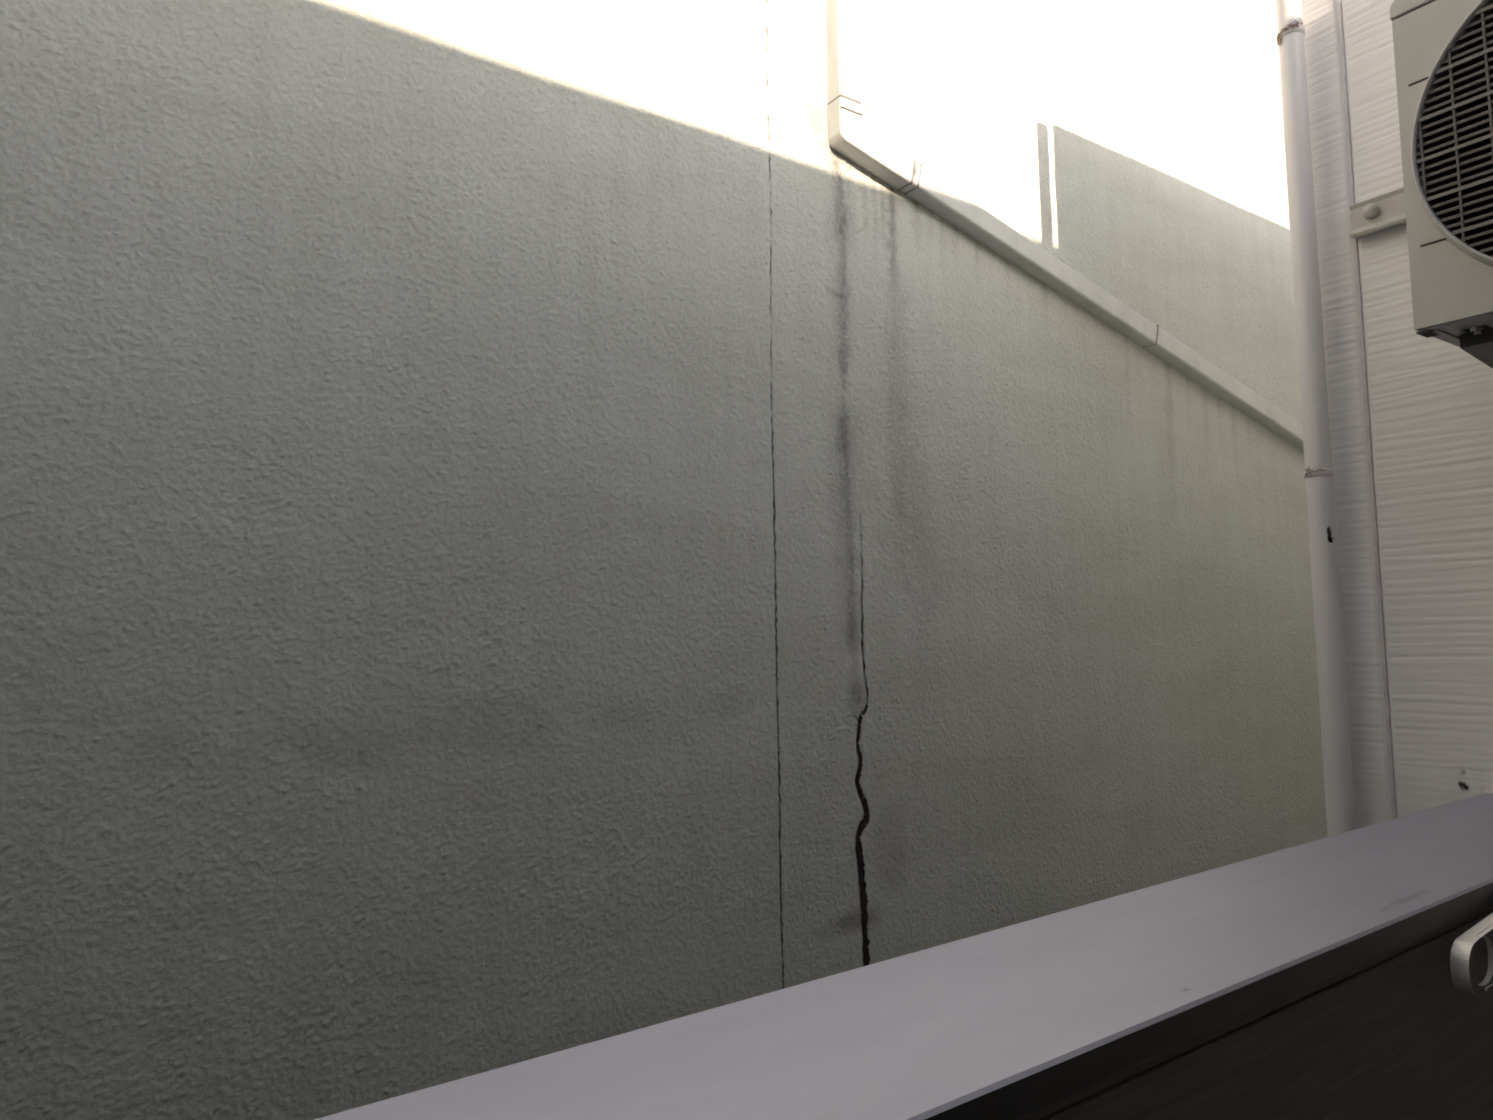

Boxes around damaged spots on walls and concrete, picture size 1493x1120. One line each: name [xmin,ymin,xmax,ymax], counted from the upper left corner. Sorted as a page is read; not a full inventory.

crack [855,557,870,966]